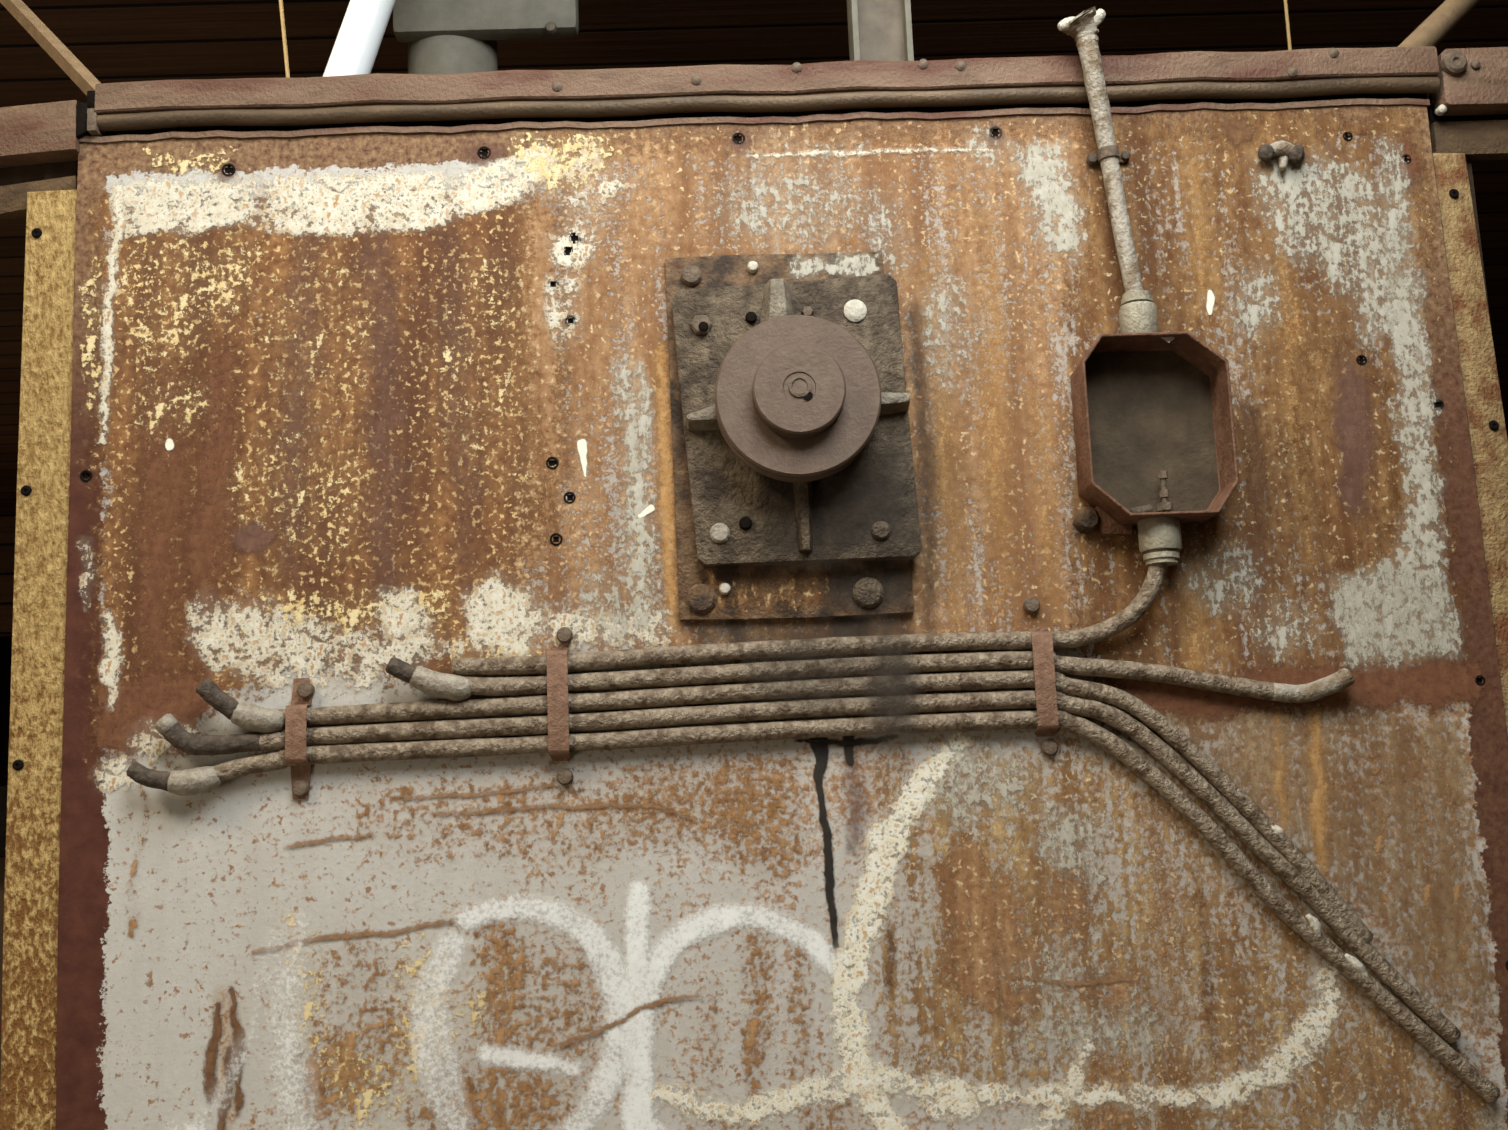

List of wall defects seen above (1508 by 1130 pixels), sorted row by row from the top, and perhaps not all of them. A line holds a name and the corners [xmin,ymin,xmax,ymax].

peeling [78,131,636,444]
peeling [77,541,125,709]
corrosion [83,106,1505,1048]
peeling [925,741,1111,886]
corrosion [203,986,245,1130]
corrosion [280,898,605,1130]
corrosion [701,982,719,1090]
corrosion [723,933,814,1130]
corrosion [782,1098,853,1130]
peeling [1001,940,1179,1058]
peeling [1324,1081,1406,1130]